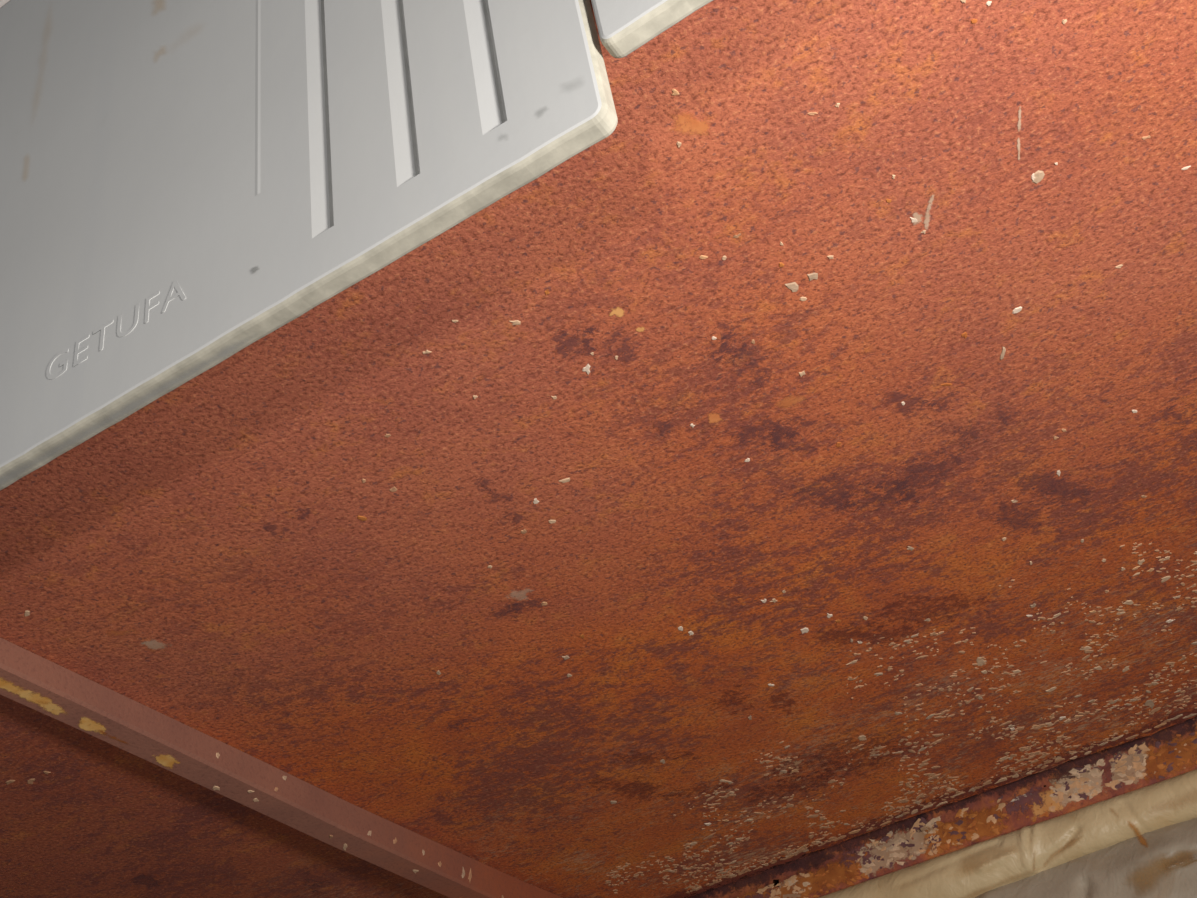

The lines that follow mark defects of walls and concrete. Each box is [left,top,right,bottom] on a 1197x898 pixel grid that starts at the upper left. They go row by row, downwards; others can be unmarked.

peeling [1031,162,1058,184]
peeling [785,273,818,301]
rust [0,678,65,715]
rust [79,717,127,744]
peeling [605,542,1197,894]
rust [153,755,180,769]
rust [665,709,1197,898]
peeling [756,873,810,898]